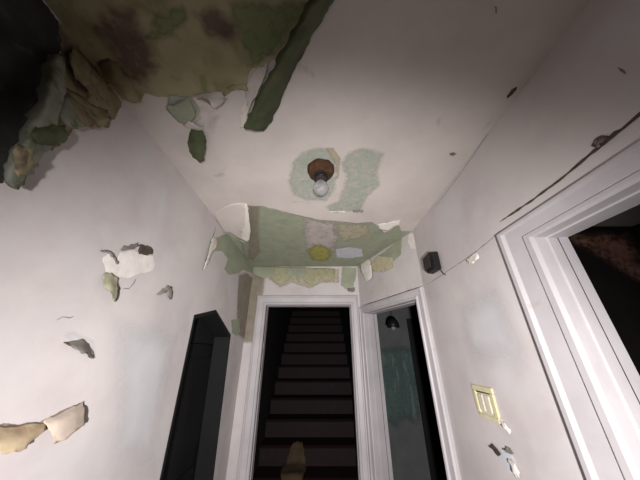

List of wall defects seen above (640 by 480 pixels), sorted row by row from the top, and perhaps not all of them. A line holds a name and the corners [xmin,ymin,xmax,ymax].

peeling [0,0,334,190]
peeling [290,148,382,213]
crack [500,112,640,222]
spalling [100,242,155,302]
peeling [157,285,173,300]
peeling [202,203,416,292]
peeling [63,334,94,359]
peeling [0,401,86,454]
spalling [488,444,520,478]